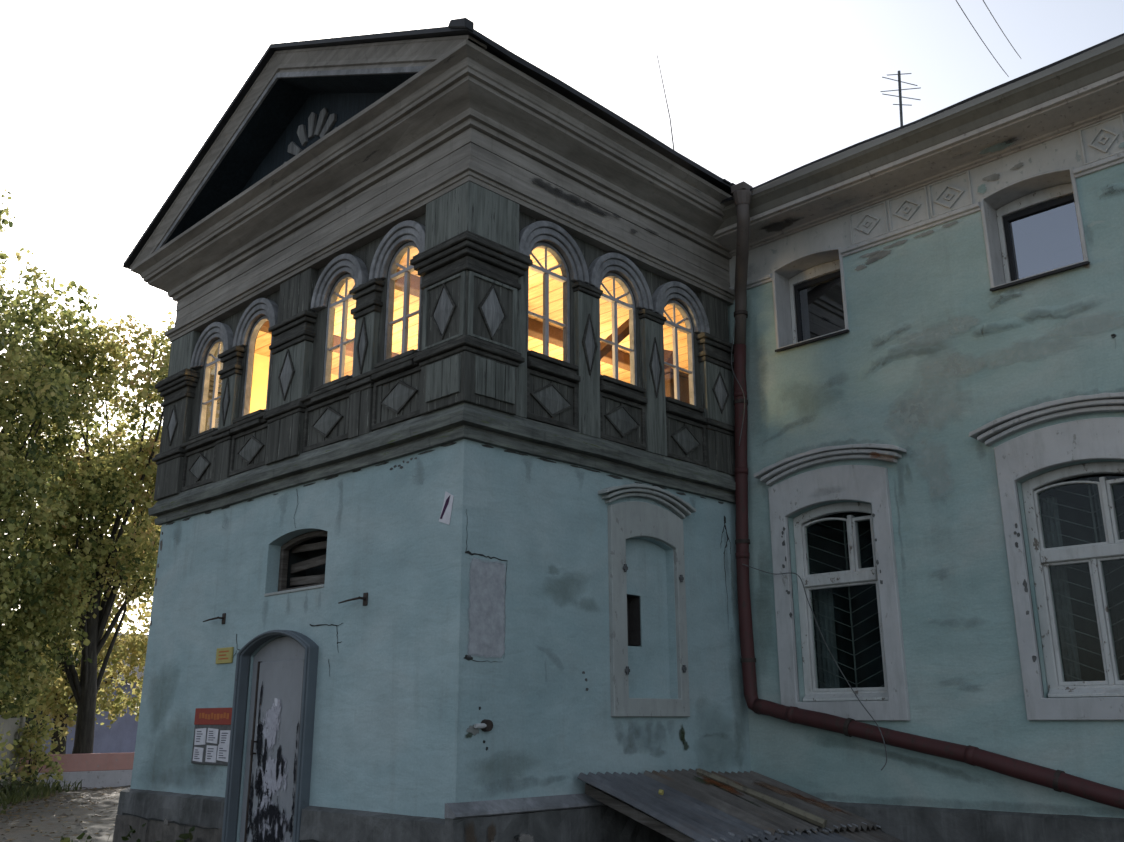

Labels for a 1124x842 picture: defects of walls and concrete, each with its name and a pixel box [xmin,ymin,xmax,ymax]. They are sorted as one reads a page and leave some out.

crack [721,516,731,609]
peeling [247,681,319,842]